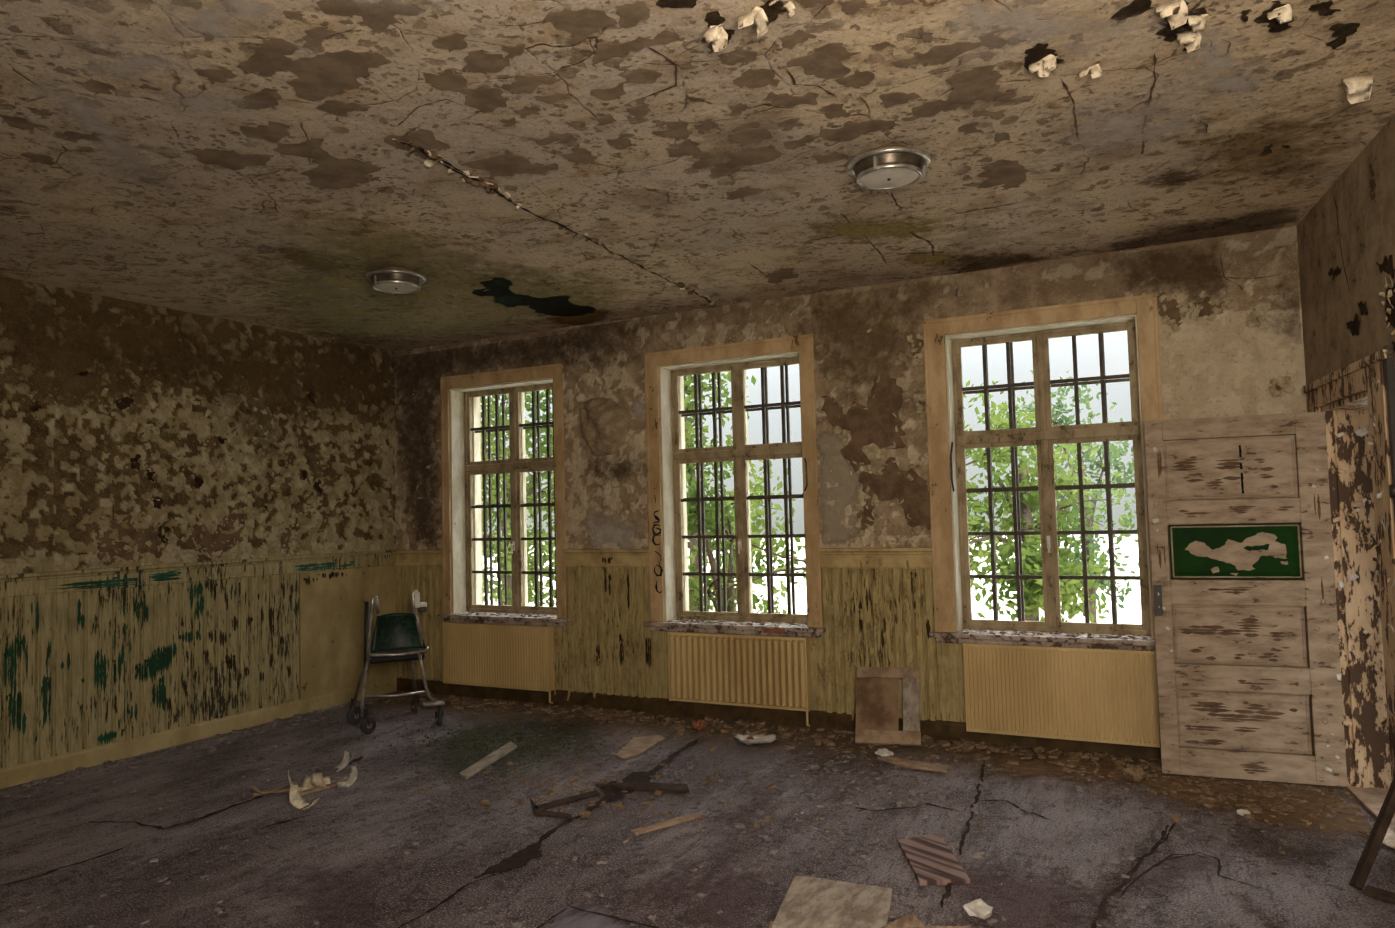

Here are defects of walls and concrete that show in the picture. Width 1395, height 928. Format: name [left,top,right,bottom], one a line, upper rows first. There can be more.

peeling [183,0,419,189]
crack [629,42,704,103]
peeling [384,0,1018,200]
crack [785,67,836,97]
flaking render [1024,43,1064,77]
flaking render [1110,0,1208,53]
flaking render [1241,0,1360,50]
crack [392,99,716,305]
flaking render [3,388,355,745]
peeling [810,295,943,721]
crack [847,761,1056,908]
crack [1053,822,1270,928]